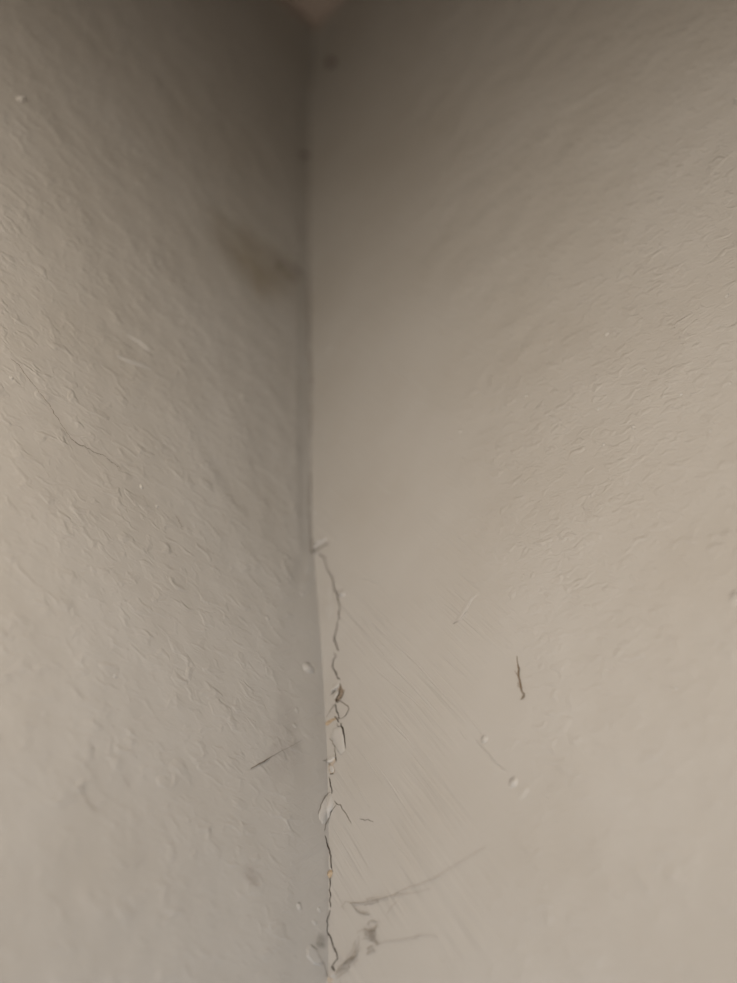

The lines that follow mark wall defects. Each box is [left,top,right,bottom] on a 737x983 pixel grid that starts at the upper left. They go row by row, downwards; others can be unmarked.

crack [311,553,373,977]